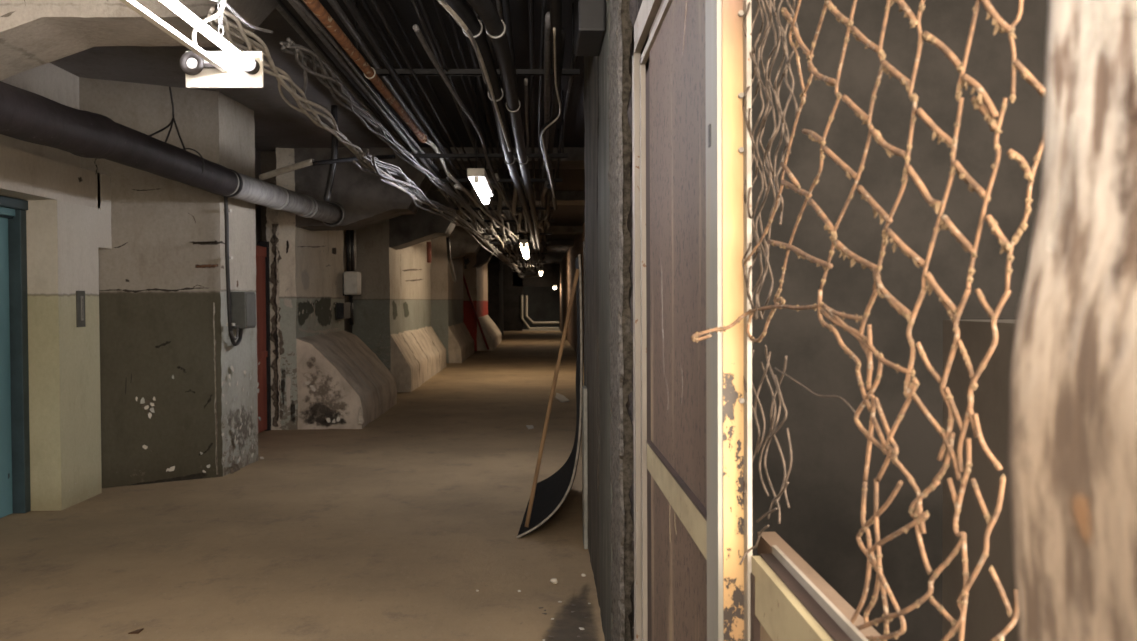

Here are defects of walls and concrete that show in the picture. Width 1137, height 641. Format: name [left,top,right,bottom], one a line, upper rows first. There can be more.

spalling [199,224,340,475]
water stain [304,358,346,427]